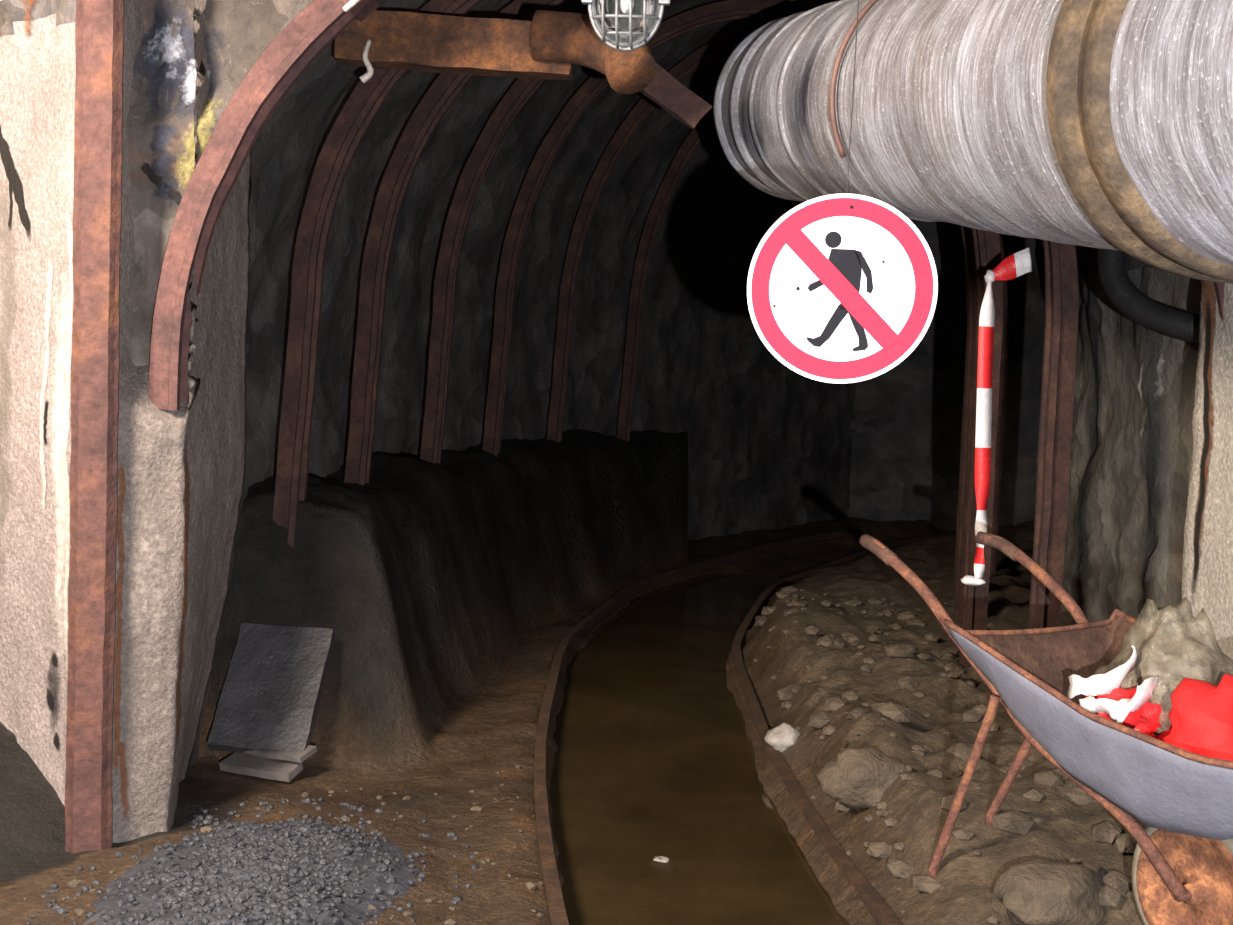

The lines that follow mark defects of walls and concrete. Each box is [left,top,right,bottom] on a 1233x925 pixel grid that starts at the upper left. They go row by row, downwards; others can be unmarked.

crack [0,128,30,235]
water stain [142,5,215,198]